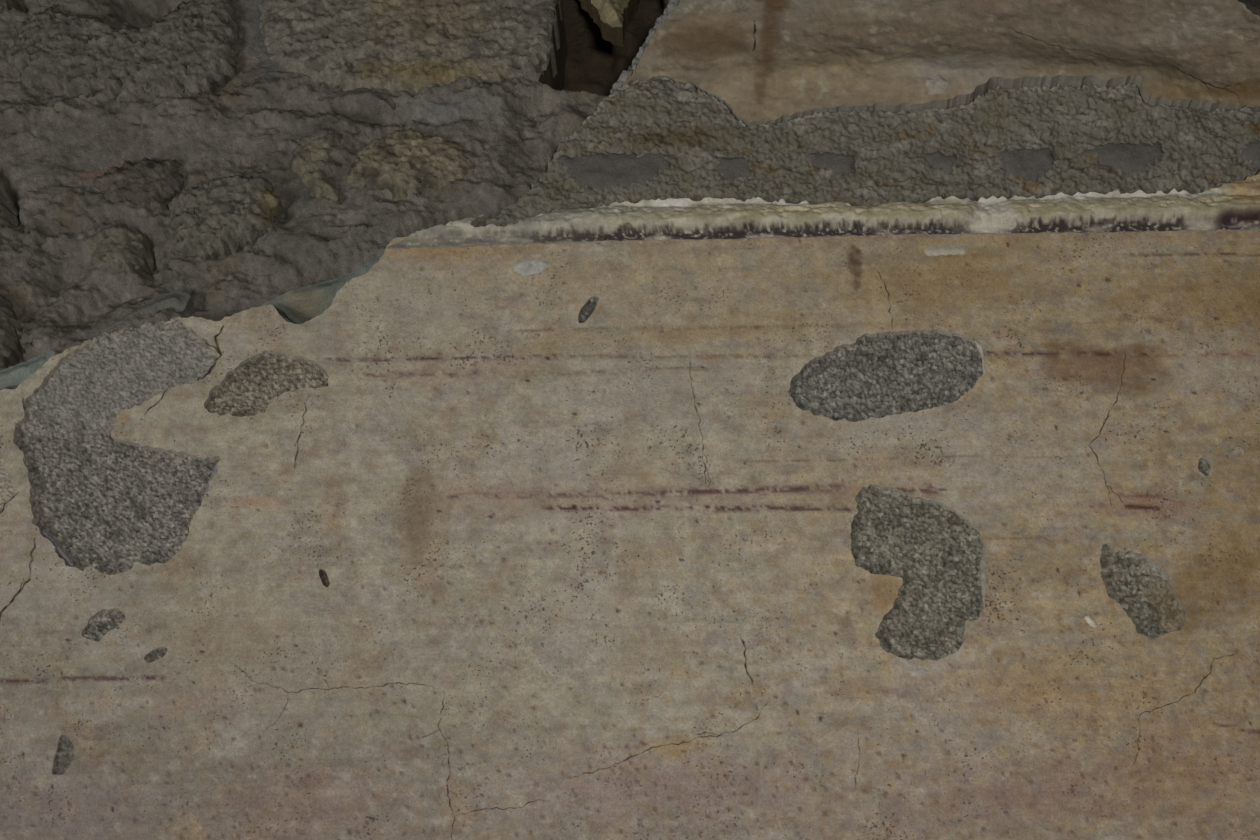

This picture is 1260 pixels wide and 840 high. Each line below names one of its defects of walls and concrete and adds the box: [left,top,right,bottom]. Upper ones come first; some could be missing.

flaking render [0,0,1260,575]
crack [0,538,35,617]
spalling [82,610,125,642]
crack [739,634,753,683]
spalling [851,486,988,677]
spalling [1100,547,1185,641]
crack [244,672,534,835]